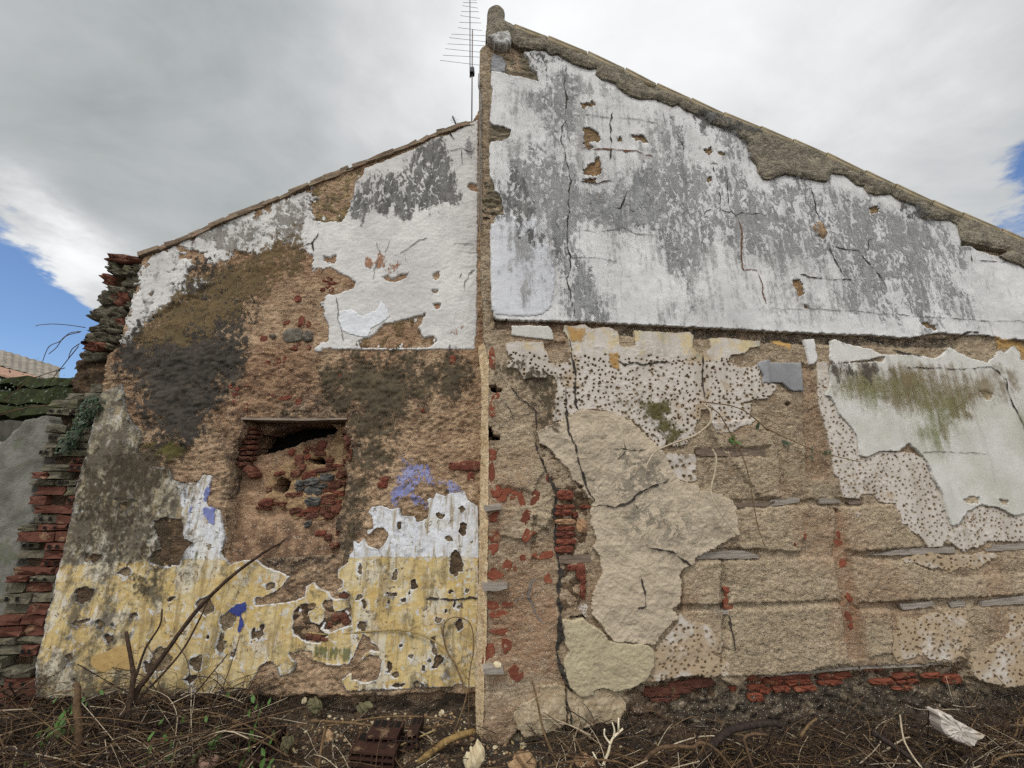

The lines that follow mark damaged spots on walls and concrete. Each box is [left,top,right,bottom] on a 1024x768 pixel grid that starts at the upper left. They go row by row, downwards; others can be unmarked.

spalling [137,121,510,259]
water stain [496,65,980,335]
water stain [365,252,401,273]
crack [560,68,1024,508]
water stain [69,195,312,596]
water stain [830,359,1017,431]
crack [505,386,573,725]
crack [650,548,692,566]
peeling [196,596,265,657]
spalling [293,593,367,643]
crack [638,578,646,609]
spalling [623,662,970,703]